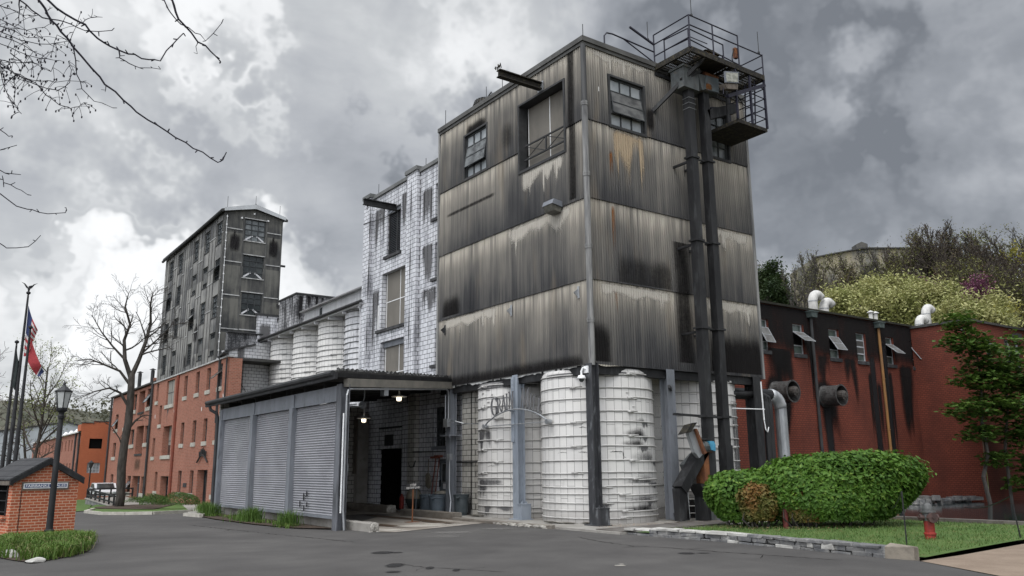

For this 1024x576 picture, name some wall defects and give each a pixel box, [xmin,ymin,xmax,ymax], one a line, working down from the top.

leakage [403,188,432,224]
leakage [509,52,576,251]
leakage [595,327,610,362]
leakage [602,241,693,363]
leakage [708,300,914,453]